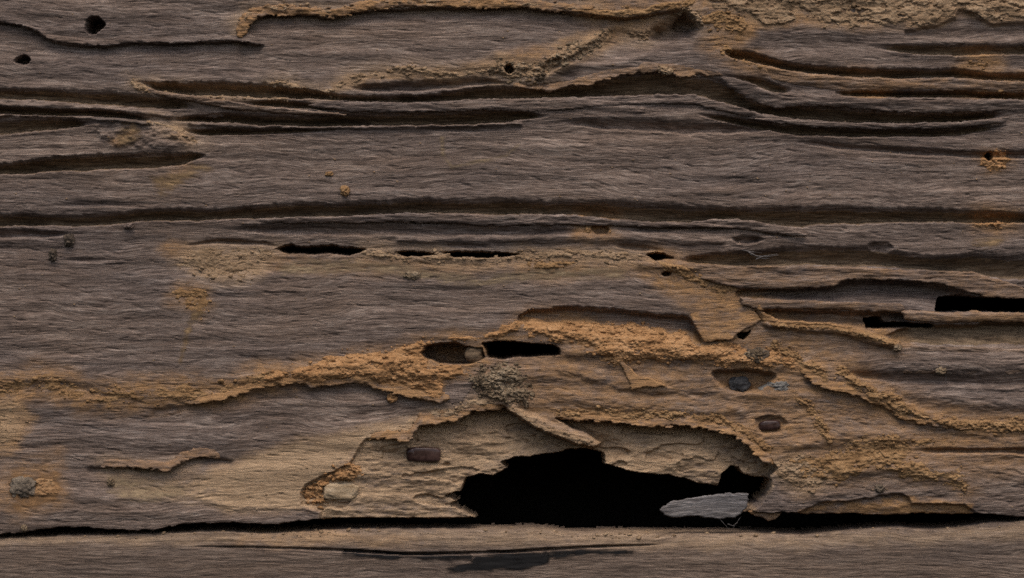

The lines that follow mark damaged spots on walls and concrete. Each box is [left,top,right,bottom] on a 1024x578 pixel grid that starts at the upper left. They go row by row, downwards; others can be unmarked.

crack [0,74,1024,159]
peeling [690,297,865,357]
peeling [620,362,667,390]
peeling [800,368,979,430]
spalling [301,370,782,521]